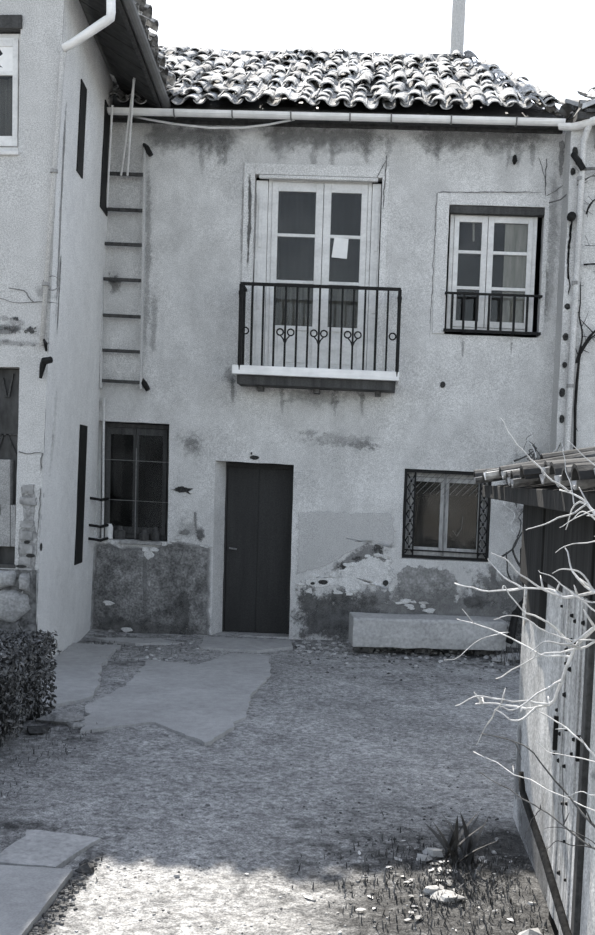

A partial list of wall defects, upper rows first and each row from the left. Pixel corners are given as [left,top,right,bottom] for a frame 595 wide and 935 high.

damp [265,126,381,148]
damp [420,130,539,150]
damp [99,557,194,635]
damp [334,543,386,570]
peeling [296,553,463,613]
damp [292,566,524,641]